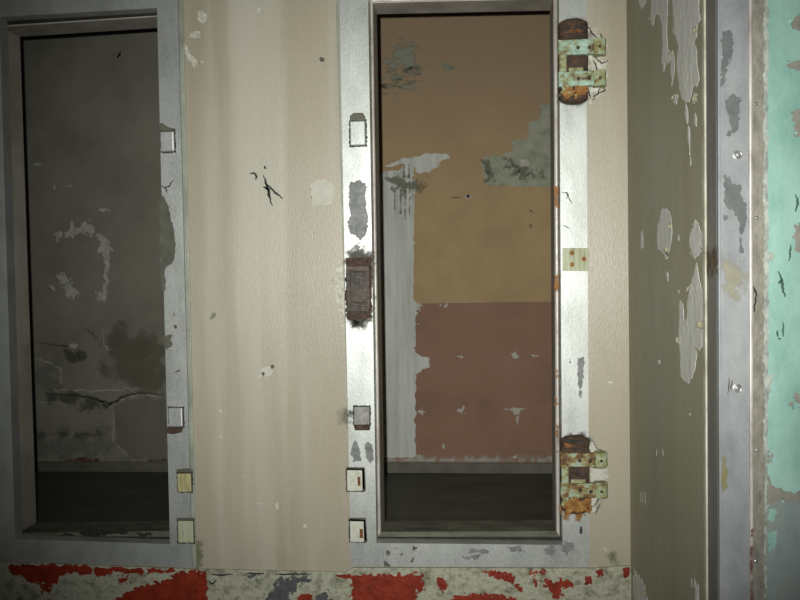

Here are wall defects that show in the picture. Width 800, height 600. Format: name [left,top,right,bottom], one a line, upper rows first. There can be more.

peeling [480,103,551,187]
peeling [639,0,700,165]
peeling [725,94,742,137]
peeling [347,180,368,251]
peeling [722,175,747,262]
peeling [379,153,499,461]
peeling [657,208,703,384]
crack [31,329,164,454]
peeling [8,563,209,600]
peeling [265,575,333,600]
peeling [335,546,448,600]
peeling [451,568,574,600]